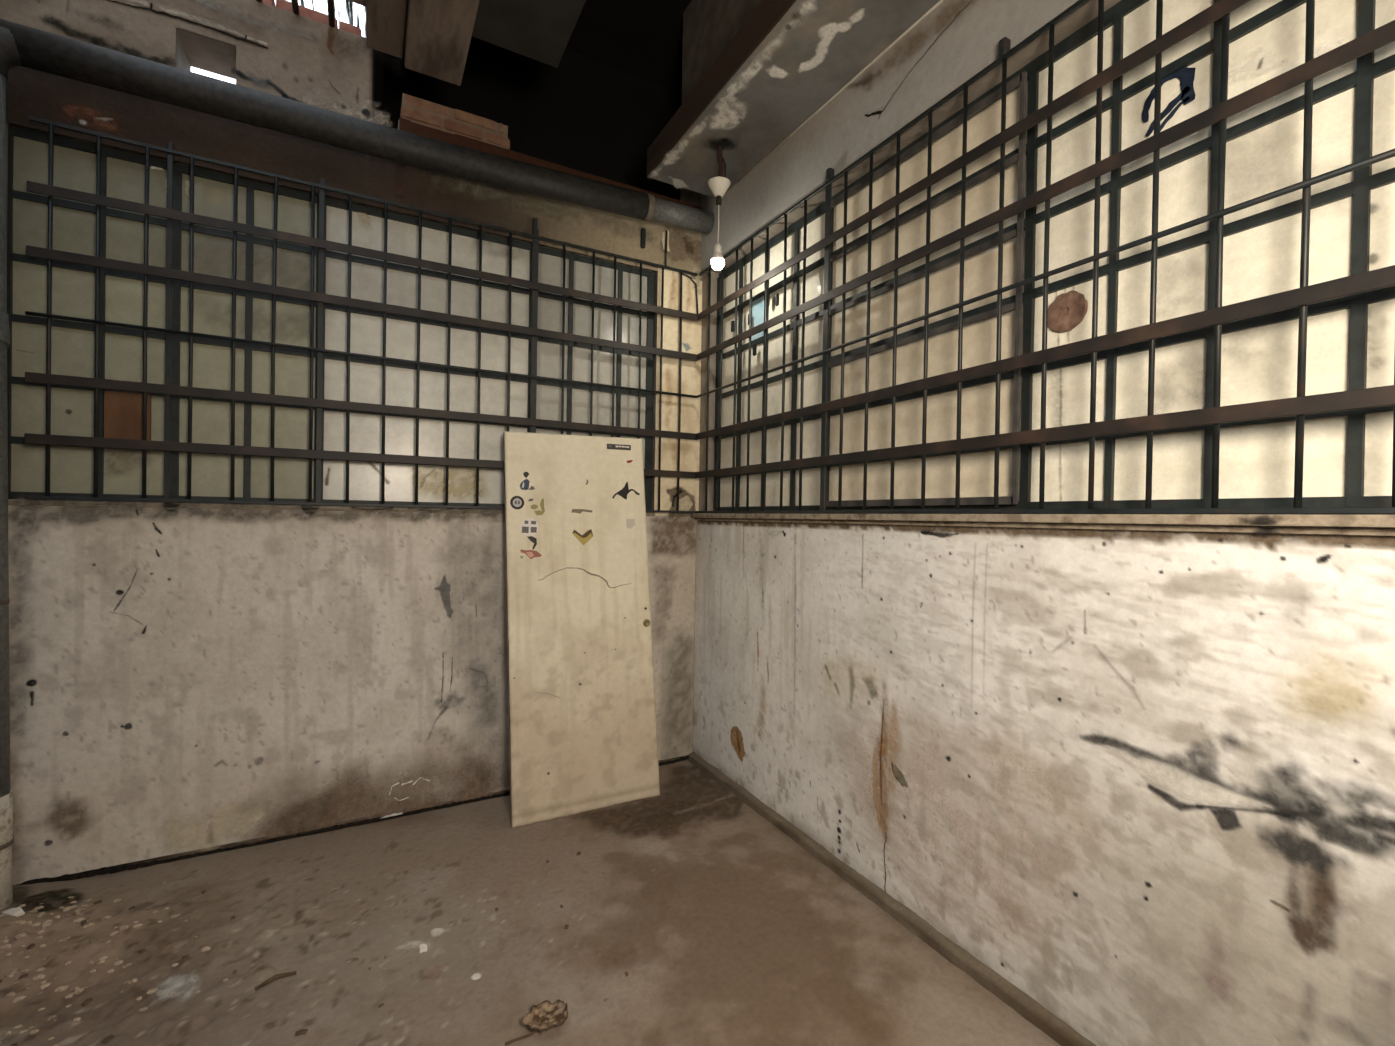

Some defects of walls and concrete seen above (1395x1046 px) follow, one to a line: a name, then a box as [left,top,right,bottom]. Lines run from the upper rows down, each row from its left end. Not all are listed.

peeling [654,1,863,186]
rust [731,727,745,761]
rust [874,714,894,839]